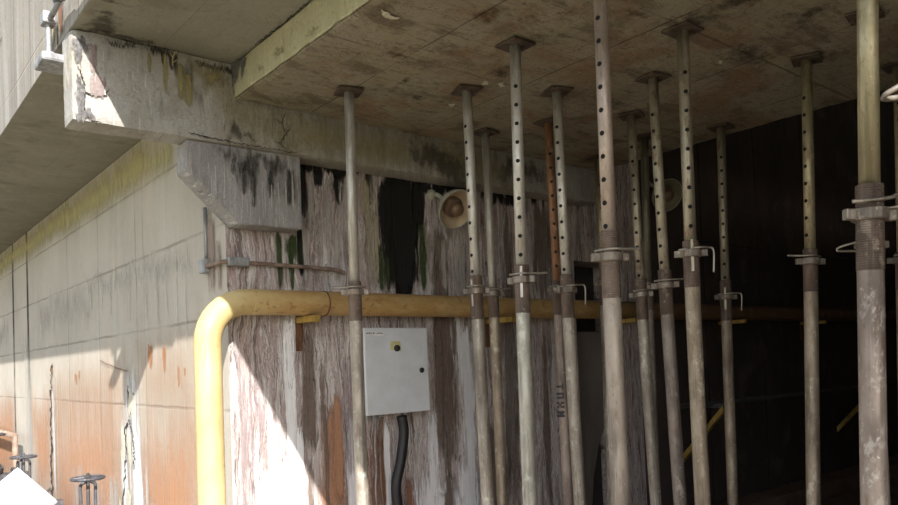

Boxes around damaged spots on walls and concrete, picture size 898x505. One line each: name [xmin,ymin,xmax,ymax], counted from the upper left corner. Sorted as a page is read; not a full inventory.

spalling [71,35,106,122]
leakage [90,1,232,105]
crack [188,113,294,153]
leakage [239,151,346,291]
leakage [357,142,466,296]
corrosion [148,345,165,372]
crack [47,365,55,494]
crack [100,360,135,505]